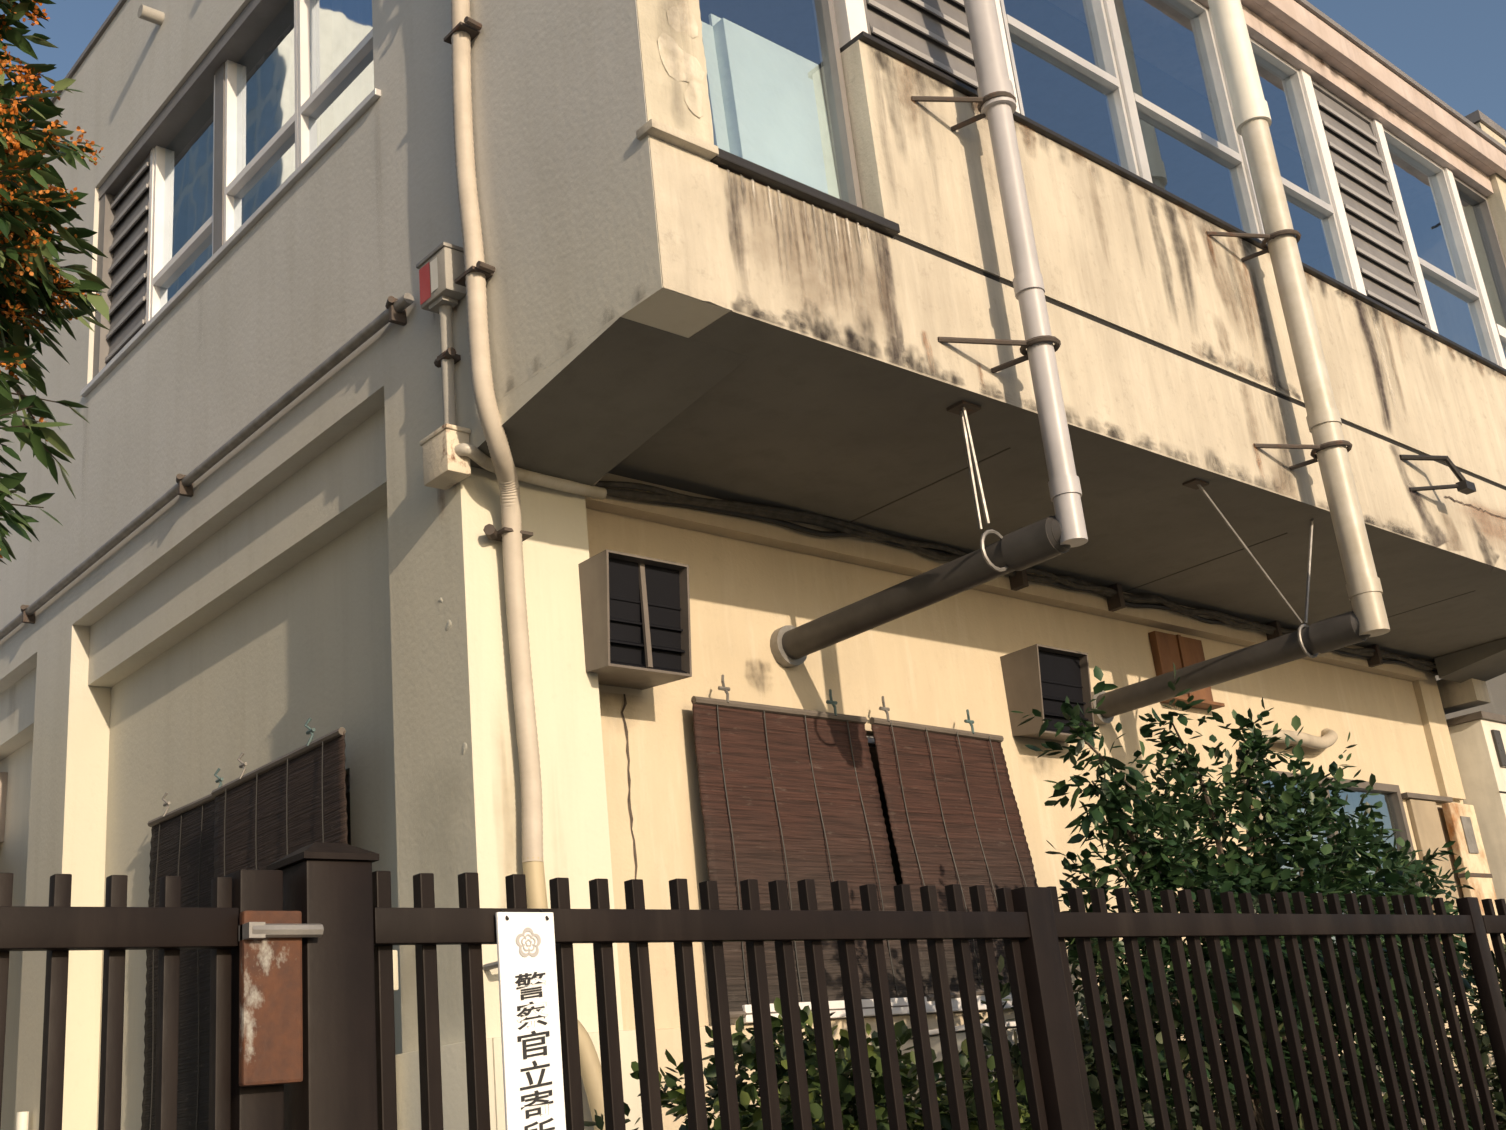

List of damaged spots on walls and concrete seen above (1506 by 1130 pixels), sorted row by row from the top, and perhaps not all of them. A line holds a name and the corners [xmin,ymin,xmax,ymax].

damp [735,176,959,384]
damp [1152,208,1192,287]
damp [1342,291,1390,426]
damp [1406,483,1445,546]